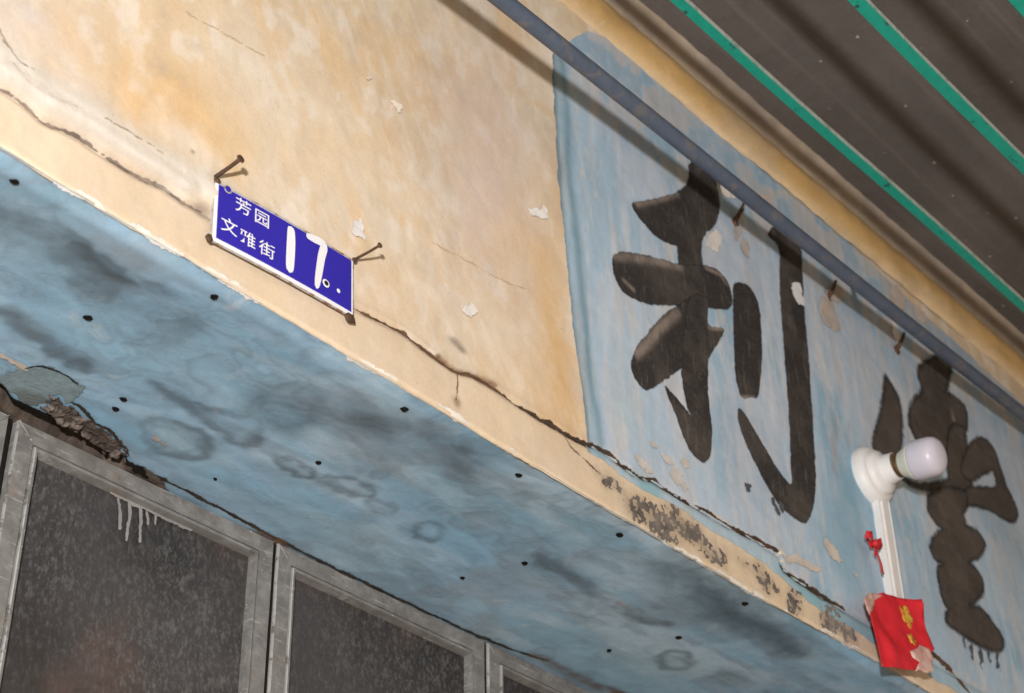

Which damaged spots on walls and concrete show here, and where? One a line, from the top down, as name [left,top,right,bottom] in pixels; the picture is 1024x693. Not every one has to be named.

crack [0,29,202,213]
peeling [351,218,366,241]
peeling [527,205,548,219]
peeling [706,226,750,258]
peeling [819,284,845,332]
spalling [0,353,168,491]
crack [355,309,848,615]
damp [110,492,192,543]
peeling [599,470,807,623]
peeling [823,538,842,563]
peeling [819,603,863,652]
crack [932,652,970,693]